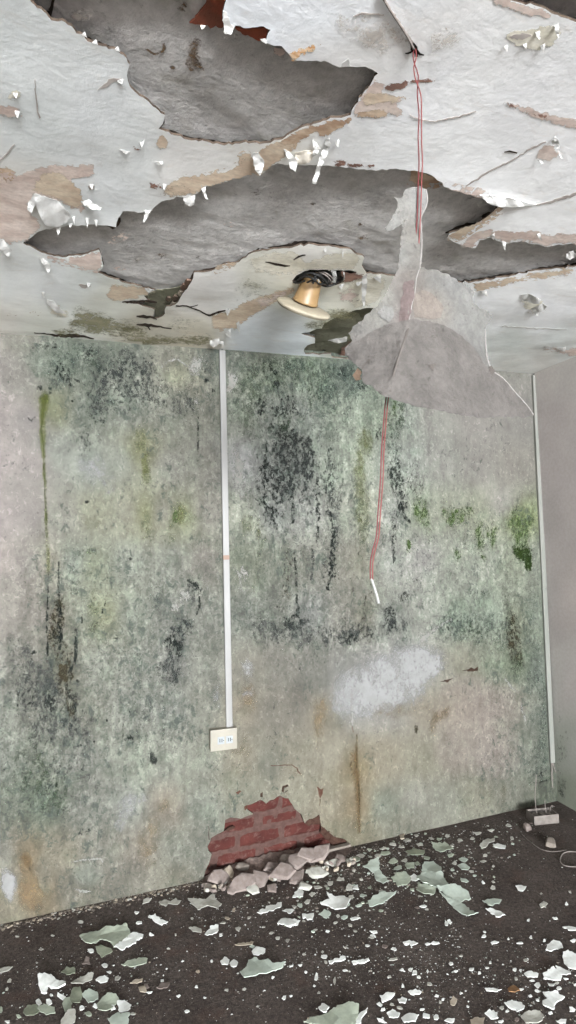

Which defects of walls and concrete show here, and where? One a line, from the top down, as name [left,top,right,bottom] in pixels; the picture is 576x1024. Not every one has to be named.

flaking render [0,0,576,356]